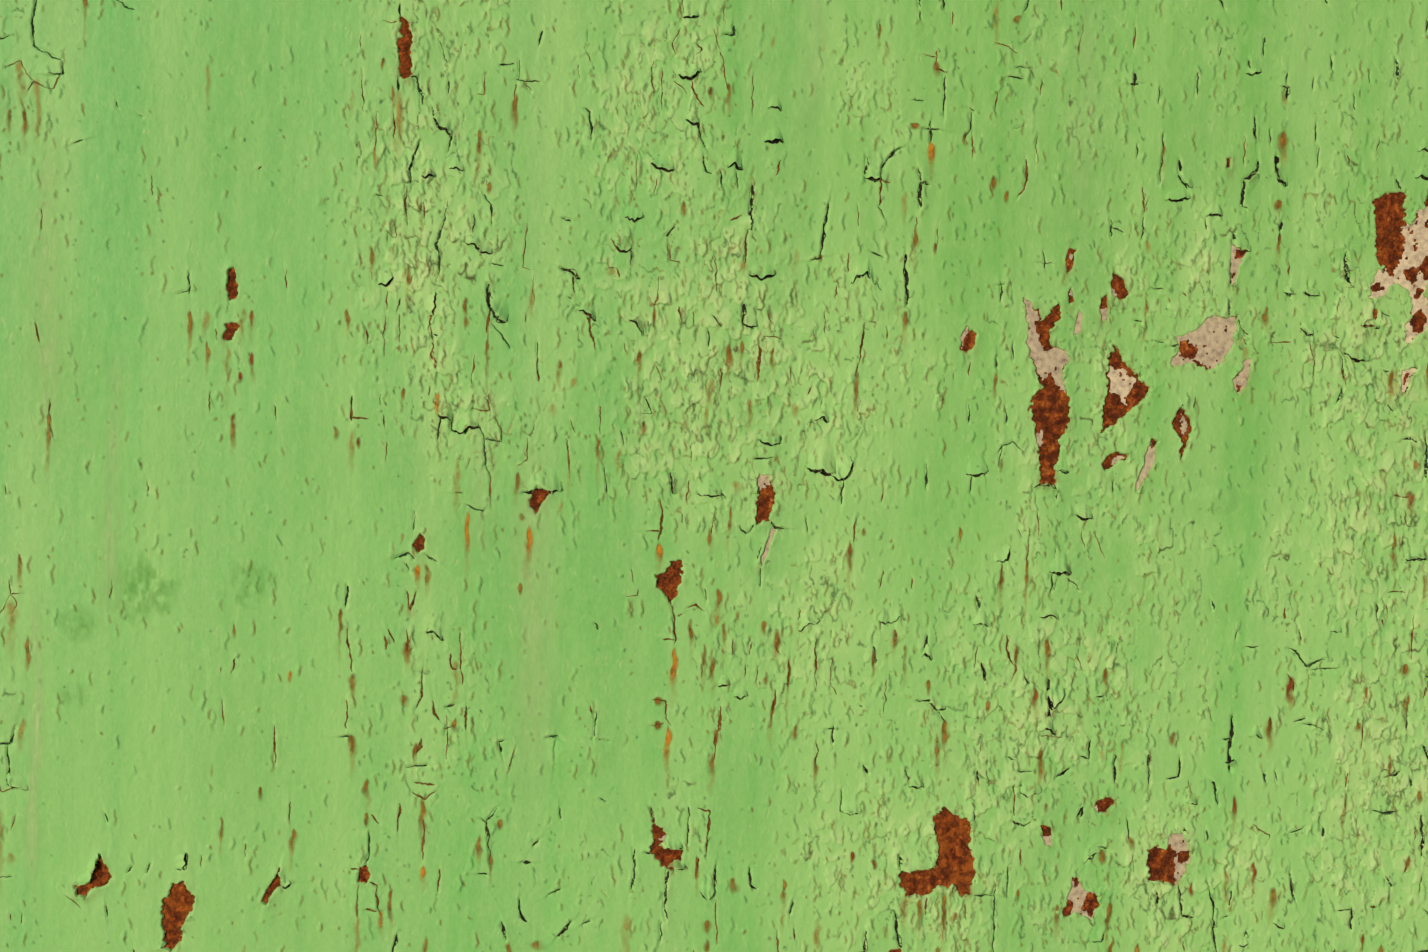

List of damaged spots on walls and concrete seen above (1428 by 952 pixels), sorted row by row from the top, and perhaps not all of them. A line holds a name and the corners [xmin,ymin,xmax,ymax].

crack [1196,37,1400,109]
crack [359,0,826,511]
crack [1205,117,1351,403]
rust [1371,188,1428,340]
crack [350,396,387,459]
rust [1023,248,1076,485]
rust [1101,346,1157,470]
crack [650,472,808,586]
crack [626,569,707,643]
rust [153,881,195,951]
rust [898,807,982,919]
rust [1129,831,1196,894]